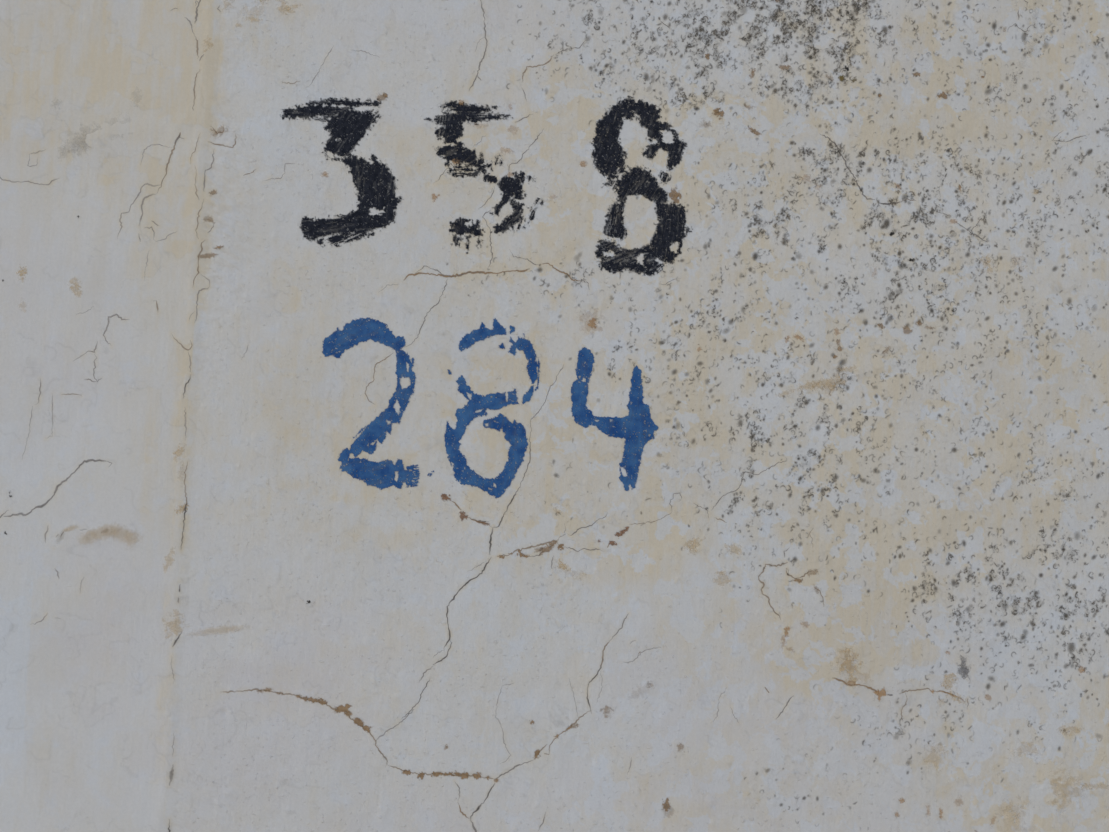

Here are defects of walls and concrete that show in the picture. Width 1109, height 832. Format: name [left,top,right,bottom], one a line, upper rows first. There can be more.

crack [470,3,487,88]
crack [508,42,584,169]
leakage [595,0,893,114]
crack [365,190,589,402]
leakage [746,191,795,251]
leakage [791,122,925,217]
leakage [861,177,961,343]
crack [23,309,125,454]
crack [0,459,112,537]
leakage [775,446,838,515]
crack [225,368,653,832]
leakage [950,532,1105,667]